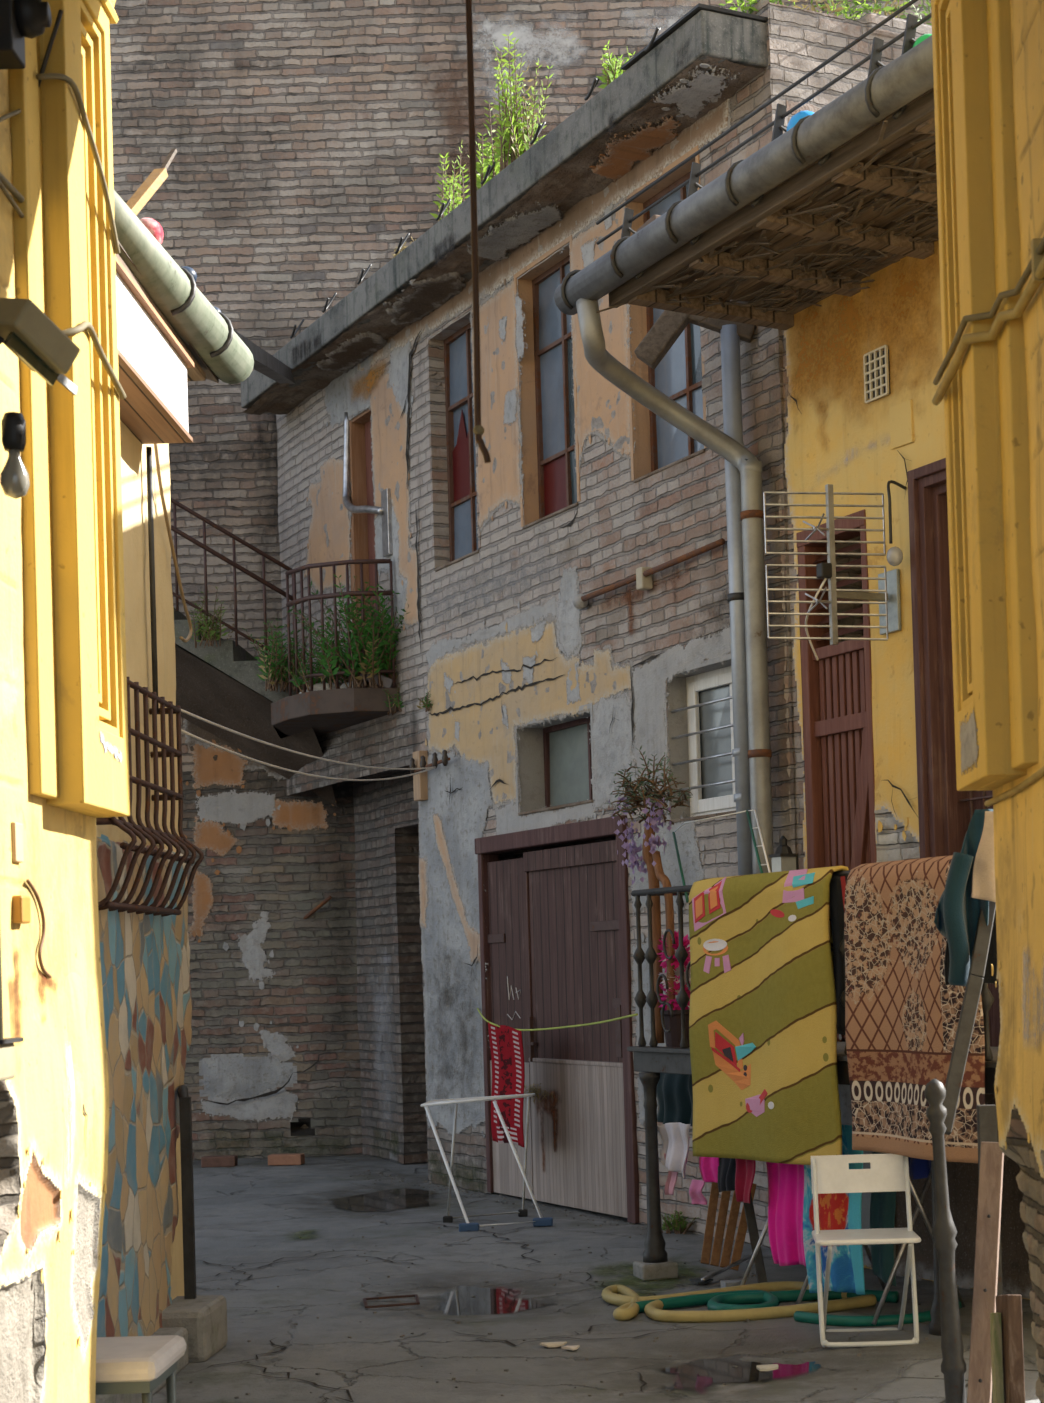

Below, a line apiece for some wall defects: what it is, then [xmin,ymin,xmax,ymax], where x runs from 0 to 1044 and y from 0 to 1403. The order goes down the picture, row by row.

peeling [316,63,742,630]
peeling [304,455,352,594]
crack [427,659,565,718]
peeling [183,719,340,942]
peeling [418,564,731,1138]
peeling [223,909,276,990]
peeling [199,1087,315,1136]
peeling [0,1080,107,1348]
peeling [894,1161,979,1289]
spalling [985,1074,1044,1403]
peeling [0,1268,46,1403]
crack [240,1361,327,1403]